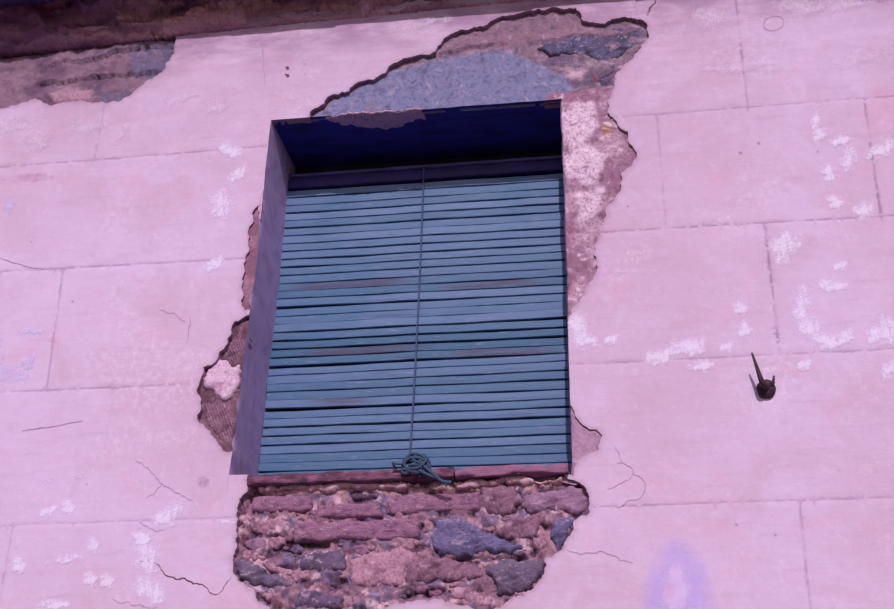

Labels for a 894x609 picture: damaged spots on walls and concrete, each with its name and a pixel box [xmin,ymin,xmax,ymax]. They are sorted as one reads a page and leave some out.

flaking render [0,40,176,109]
flaking render [304,10,649,346]
flaking render [199,200,264,452]
crack [135,460,193,501]
flaking render [221,407,602,609]
crack [607,448,646,508]
crack [141,561,229,595]